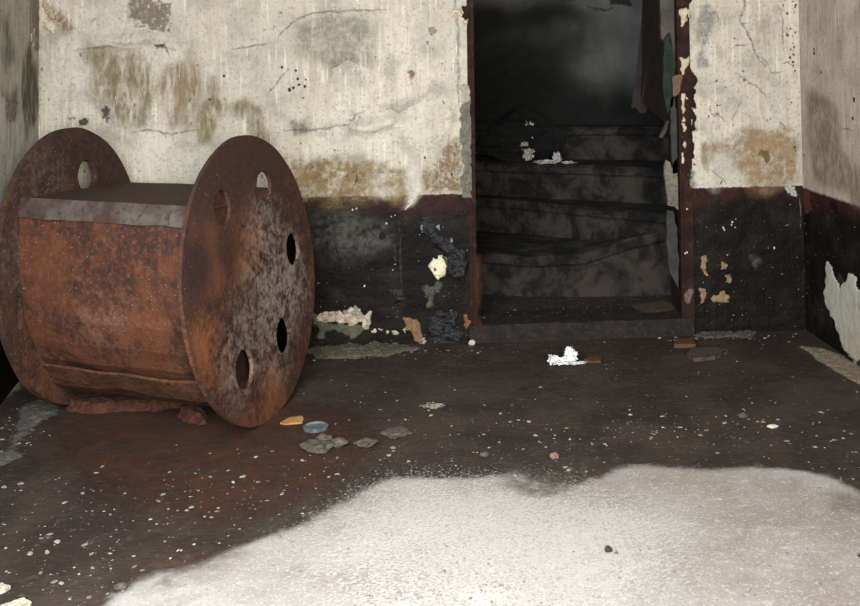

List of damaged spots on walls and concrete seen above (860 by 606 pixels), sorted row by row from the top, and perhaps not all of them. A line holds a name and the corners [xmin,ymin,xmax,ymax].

leakage [125,0,172,33]
leakage [93,50,150,123]
leakage [162,65,197,123]
leakage [198,85,222,142]
leakage [234,101,265,140]
peeling [672,0,712,188]
leakage [703,130,813,229]
flaking render [428,255,448,280]
flaking render [684,254,732,304]
flaking render [313,305,426,344]
peeling [823,261,860,367]
leakage [0,330,860,606]